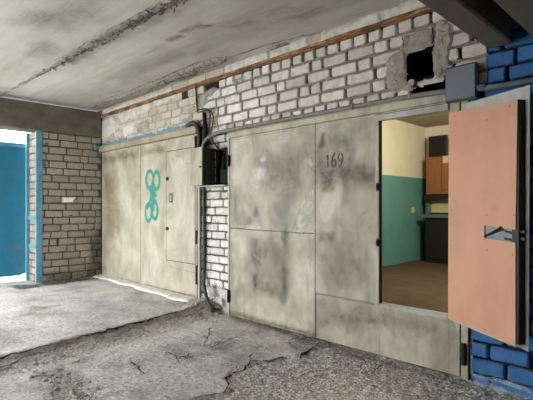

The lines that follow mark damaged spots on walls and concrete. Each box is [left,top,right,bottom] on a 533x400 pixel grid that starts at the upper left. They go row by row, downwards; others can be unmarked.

flaking render [87,0,426,139]
crack [236,318,321,358]
crack [186,353,282,398]